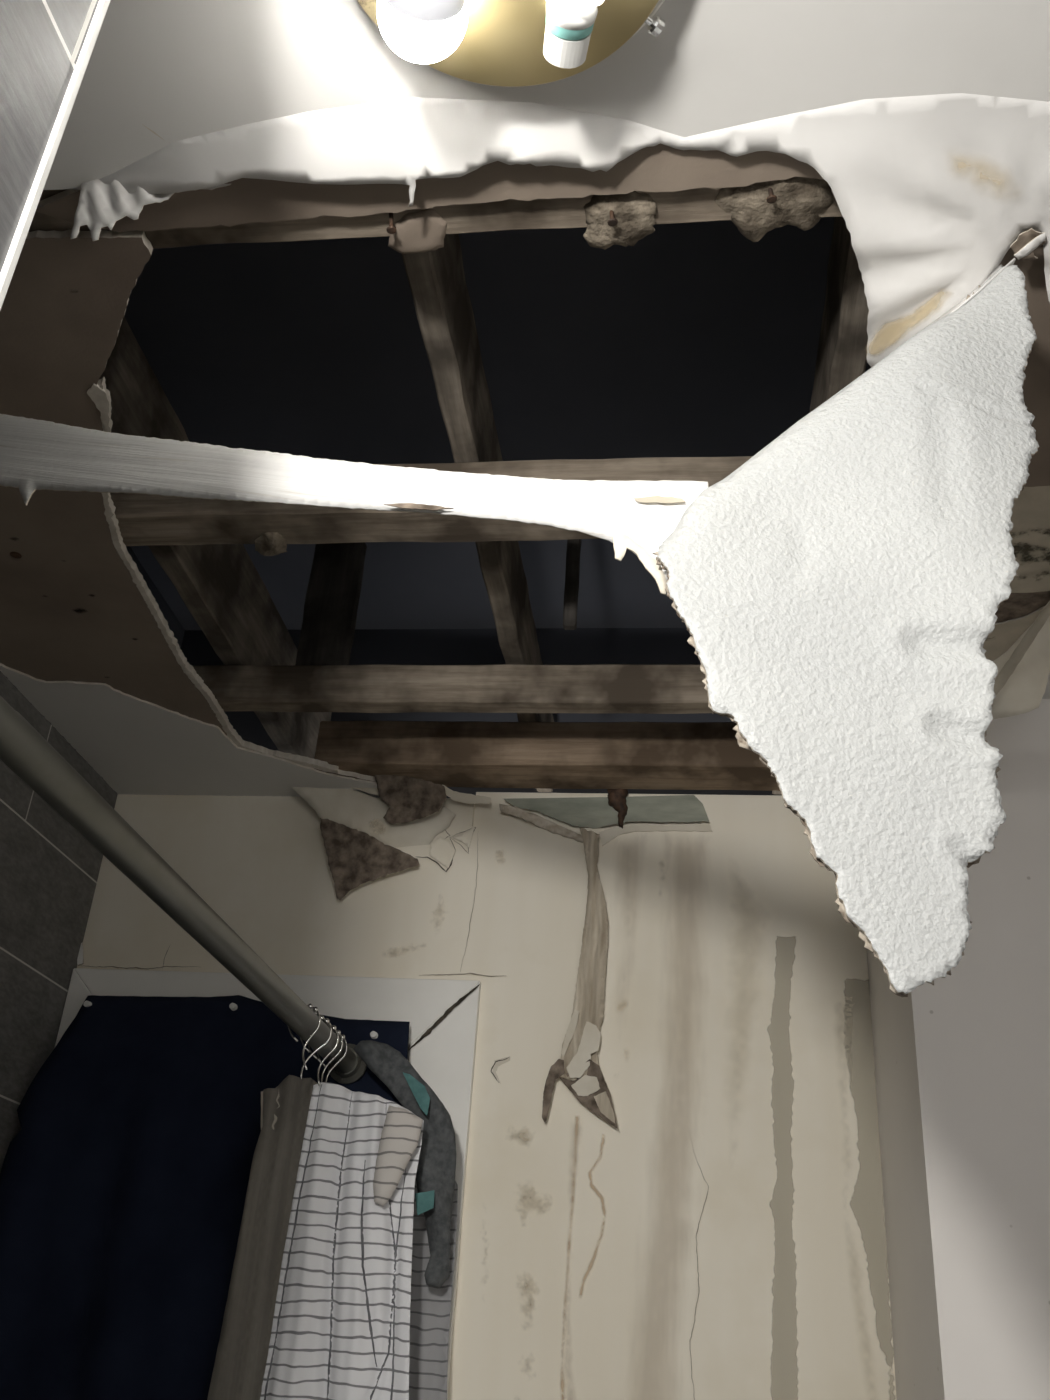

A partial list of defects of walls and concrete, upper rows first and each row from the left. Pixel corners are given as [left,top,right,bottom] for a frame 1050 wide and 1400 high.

peeling [0,258,1039,1129]
damp [1012,530,1050,579]
damp [768,937,798,1400]
damp [844,979,895,1400]